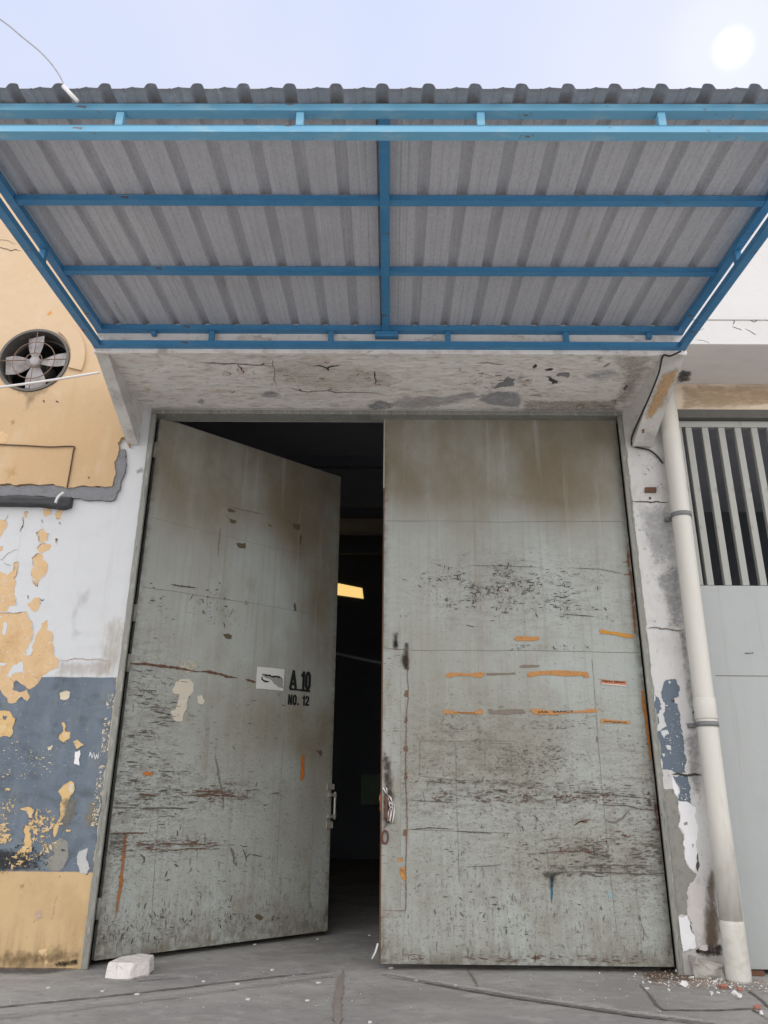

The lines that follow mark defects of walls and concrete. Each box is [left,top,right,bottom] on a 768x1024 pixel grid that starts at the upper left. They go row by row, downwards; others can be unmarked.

crack [214,358,385,396]
water stain [481,392,519,407]
peeling [0,508,90,875]
peeling [91,695,114,827]
flaking render [395,679,708,954]